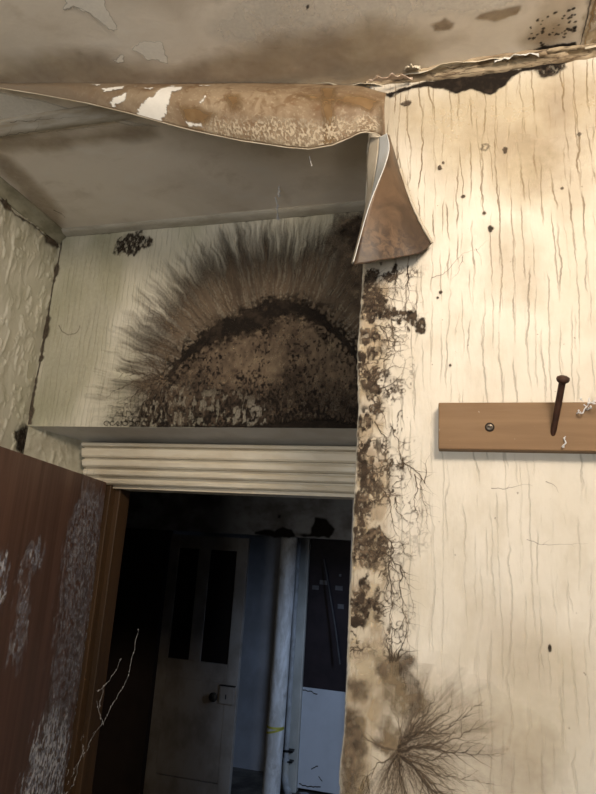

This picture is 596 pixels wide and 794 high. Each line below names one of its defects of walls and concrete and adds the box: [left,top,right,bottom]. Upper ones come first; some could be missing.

leakage [435,20,452,30]
leakage [479,7,520,20]
leakage [528,7,577,46]
leakage [386,63,565,106]
leakage [113,213,386,572]
leakage [342,585,494,794]